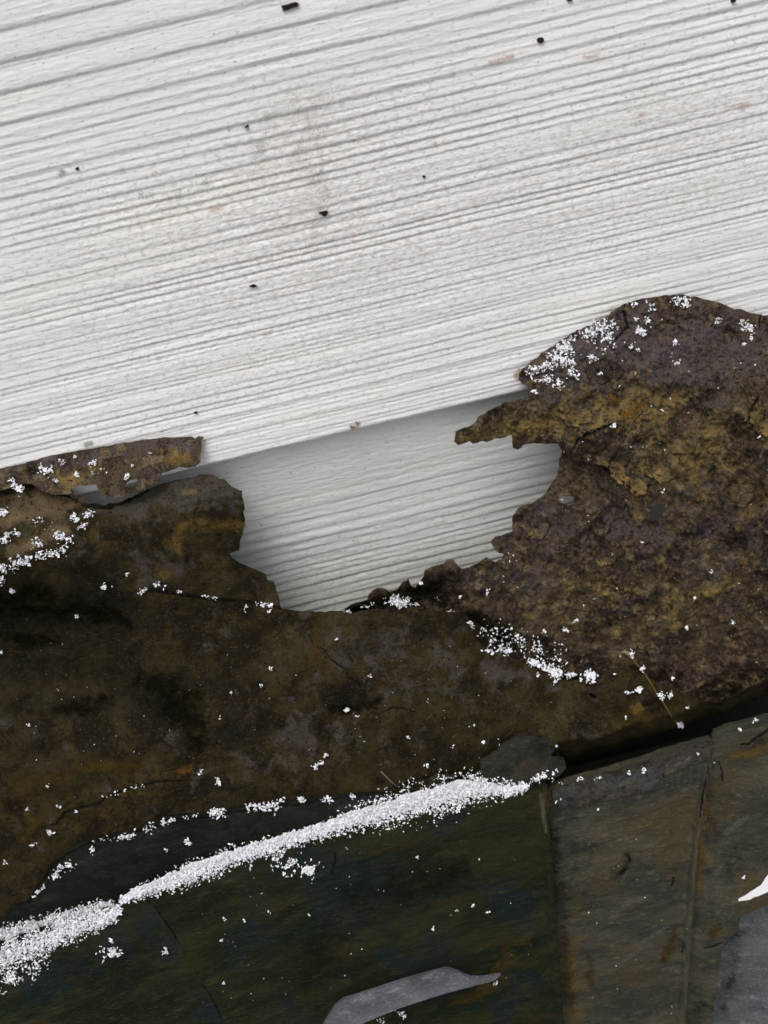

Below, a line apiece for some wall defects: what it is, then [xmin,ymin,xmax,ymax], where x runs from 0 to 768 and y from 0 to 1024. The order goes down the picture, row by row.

rust [0,490,85,560]
rust [345,294,768,701]
crack [40,780,191,828]
water stain [335,797,389,813]
crack [28,795,362,904]